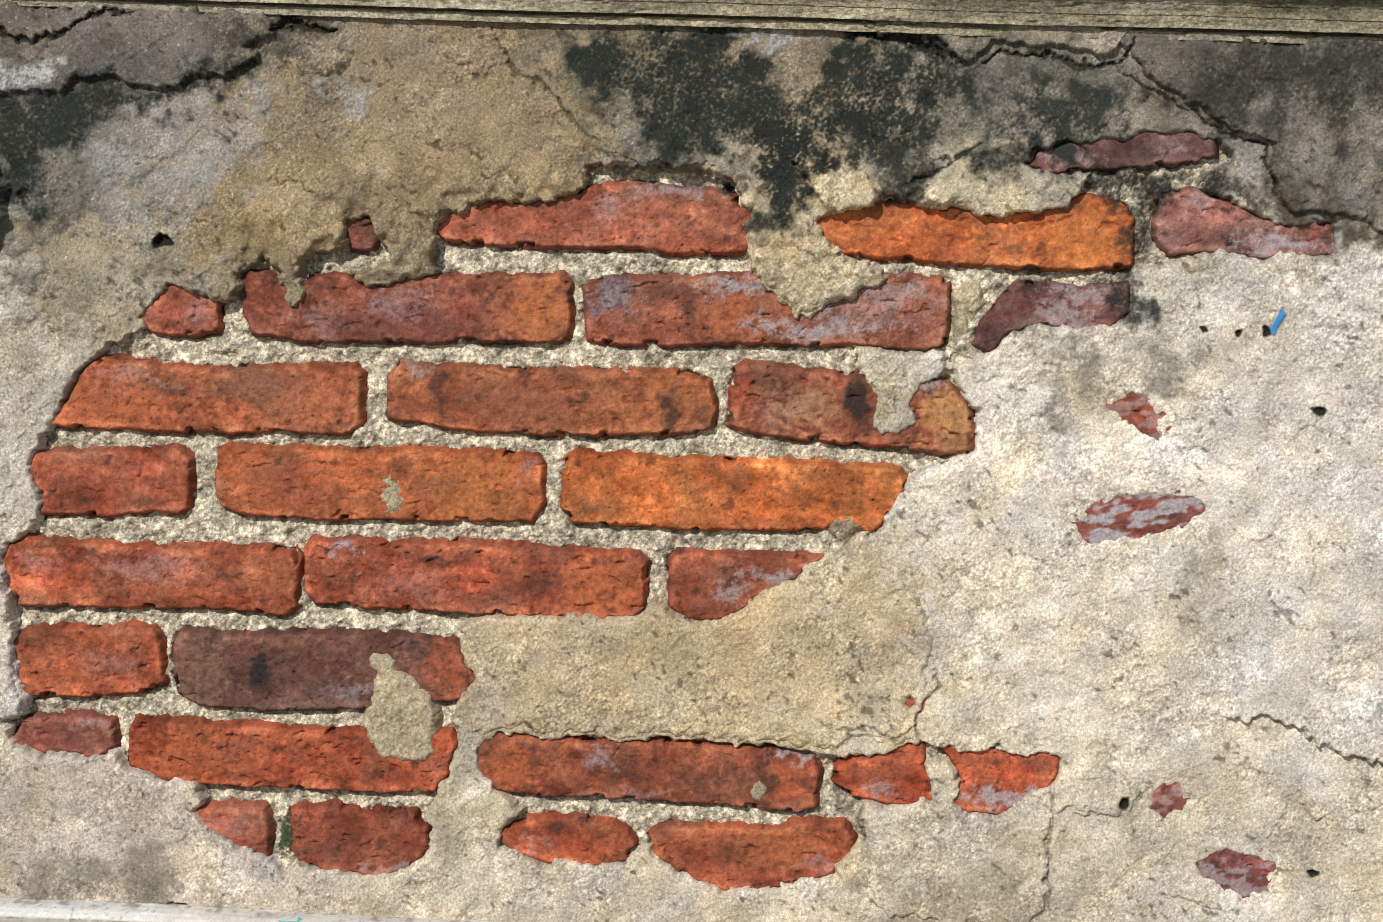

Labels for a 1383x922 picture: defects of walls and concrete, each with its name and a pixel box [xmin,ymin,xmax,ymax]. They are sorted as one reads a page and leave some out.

crack [0,7,133,45]
damp [272,15,335,41]
crack [847,31,943,61]
damp [0,23,269,221]
flaking render [598,96,695,169]
flaking render [668,100,738,174]
damp [566,25,976,232]
crack [911,142,983,183]
crack [982,39,1278,196]
flaking render [0,131,1334,875]
flaking render [478,731,1190,922]
flaking render [1152,832,1276,922]